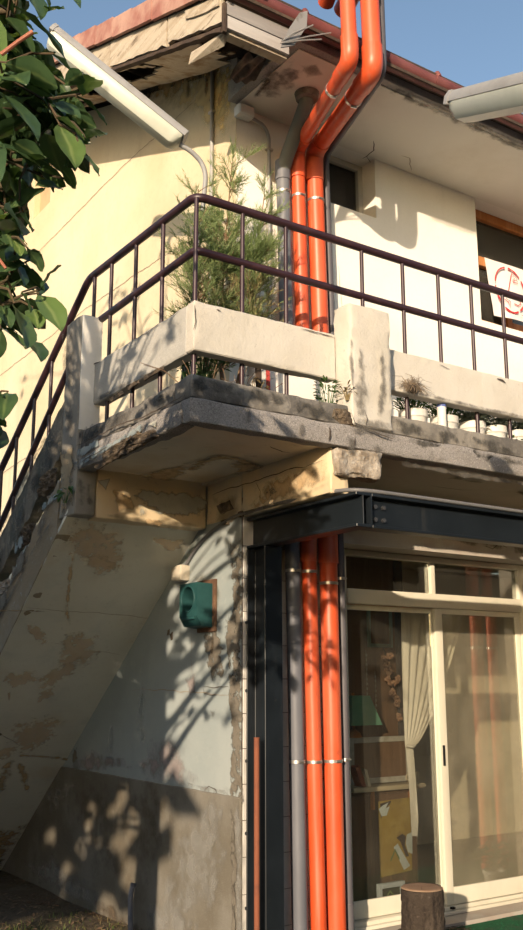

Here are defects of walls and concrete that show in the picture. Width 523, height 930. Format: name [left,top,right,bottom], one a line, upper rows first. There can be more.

leakage [79,413,127,442]
leakage [298,403,331,418]
leakage [350,422,387,452]
crack [213,447,319,495]
spalling [0,420,159,612]
peeling [134,490,244,525]
crack [147,686,229,696]
peeling [226,551,243,803]
leakage [150,805,222,930]